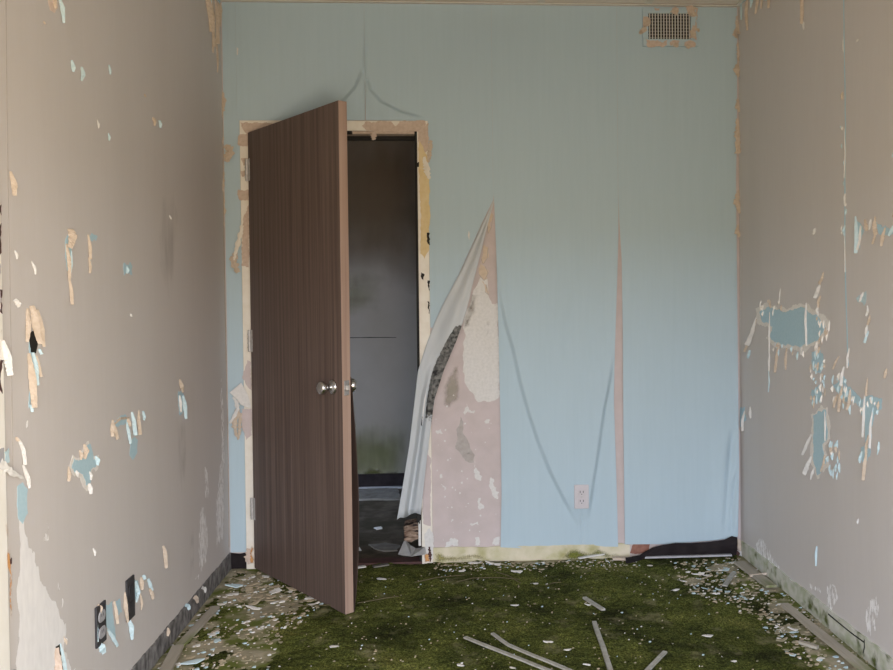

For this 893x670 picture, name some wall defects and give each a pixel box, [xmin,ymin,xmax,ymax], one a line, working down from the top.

peeling [743,0,893,481]
peeling [0,340,13,394]
peeling [13,298,46,412]
flaking render [436,278,500,508]
peeling [740,406,752,431]
peeling [67,441,100,494]
peeling [54,637,68,670]